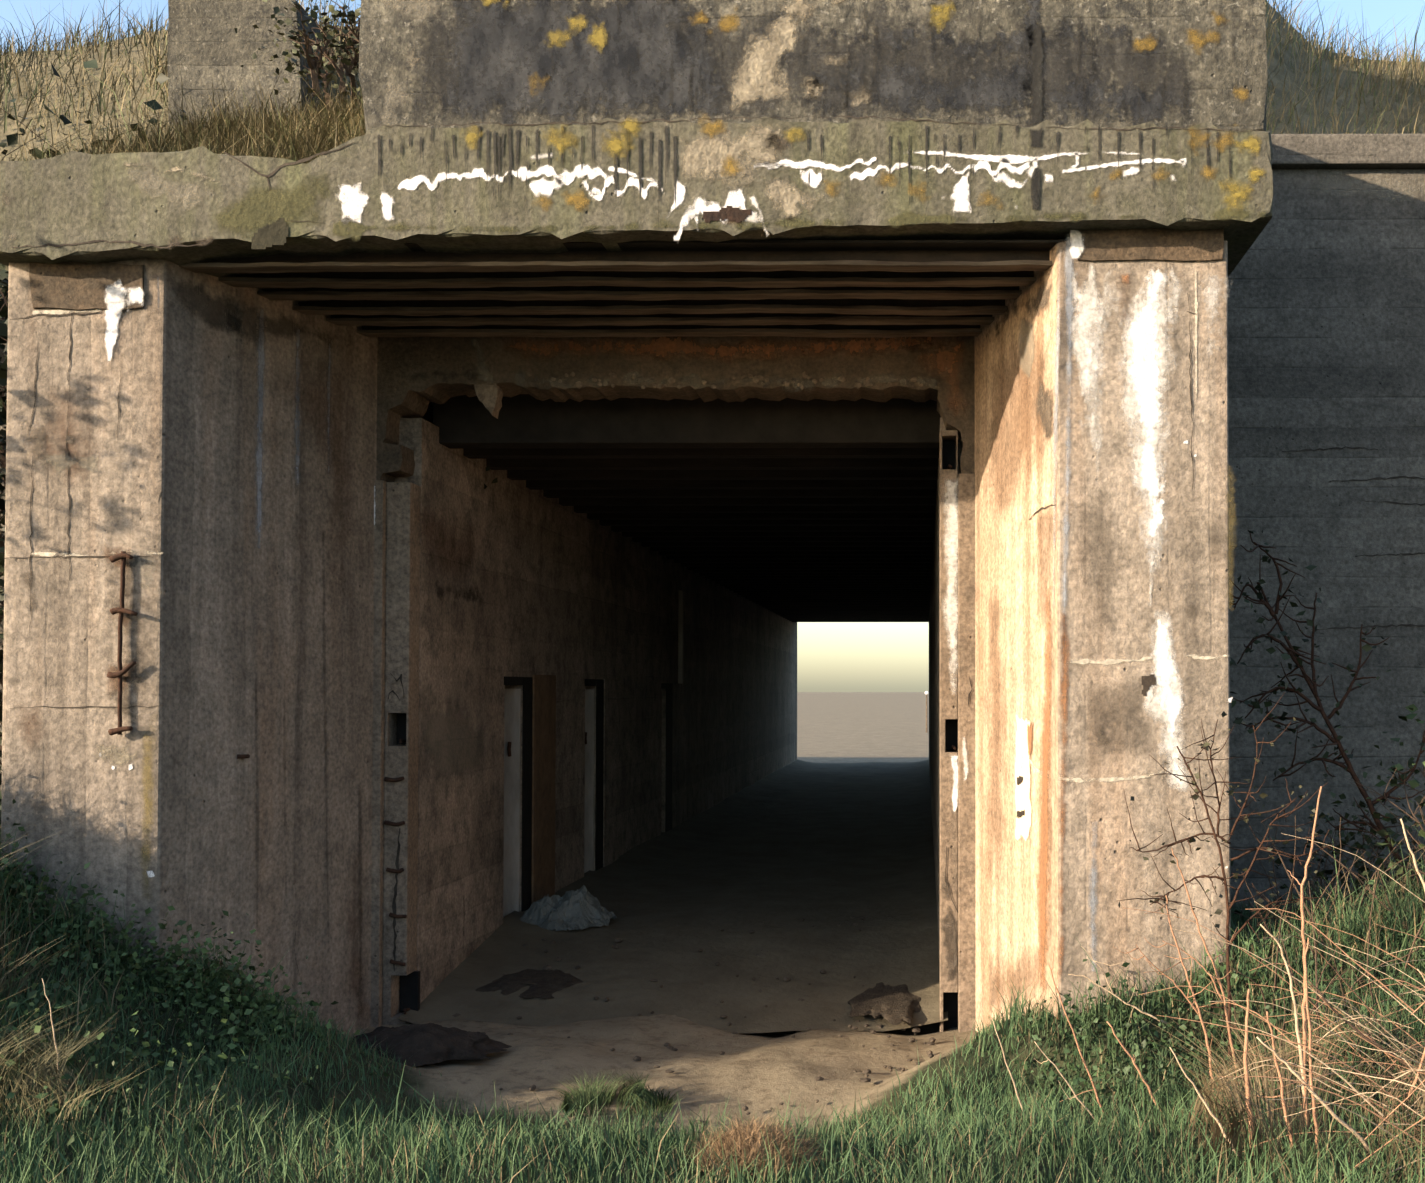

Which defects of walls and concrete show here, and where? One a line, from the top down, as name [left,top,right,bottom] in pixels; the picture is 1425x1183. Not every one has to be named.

water stain [338,0,1232,224]
water stain [105,280,303,533]
water stain [995,237,1073,607]
water stain [1124,271,1168,600]
corrosion [107,551,138,736]
water stain [1142,616,1187,788]